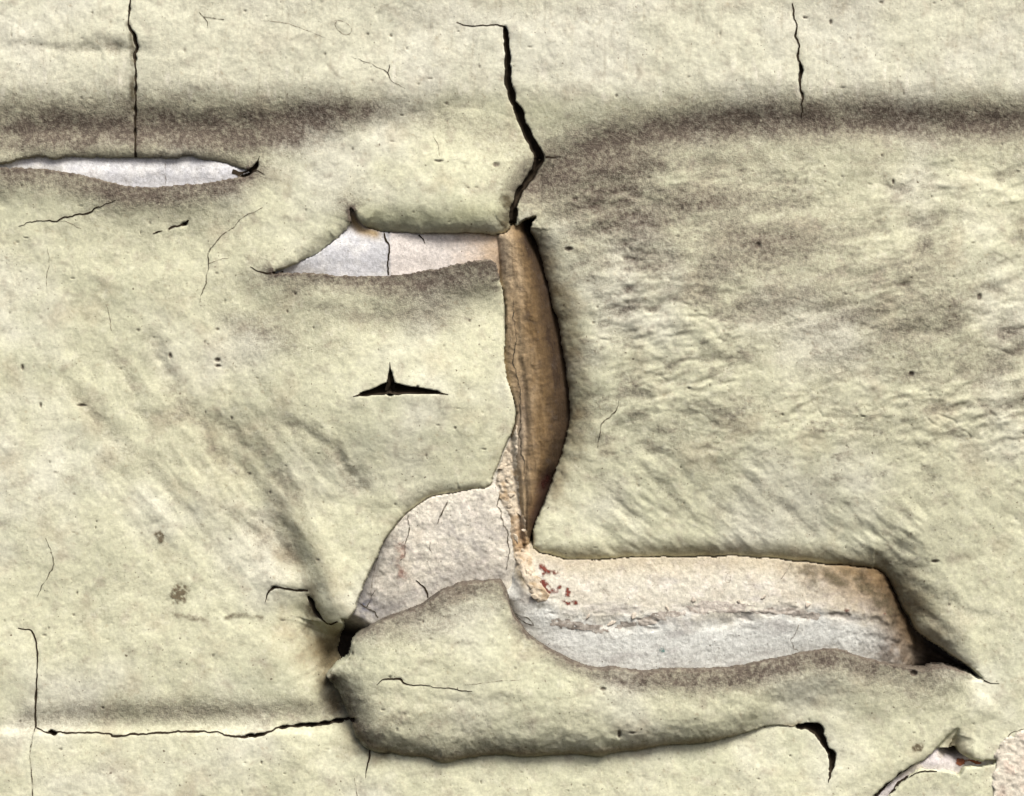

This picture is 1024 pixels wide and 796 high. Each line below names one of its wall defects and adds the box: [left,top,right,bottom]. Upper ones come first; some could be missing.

peeling [0,155,250,187]
crack [128,0,139,157]
crack [456,22,561,224]
crack [792,3,804,118]
crack [353,382,448,397]
peeling [275,210,968,670]
crack [265,586,338,625]
crack [18,628,354,796]
spalling [873,730,1024,796]